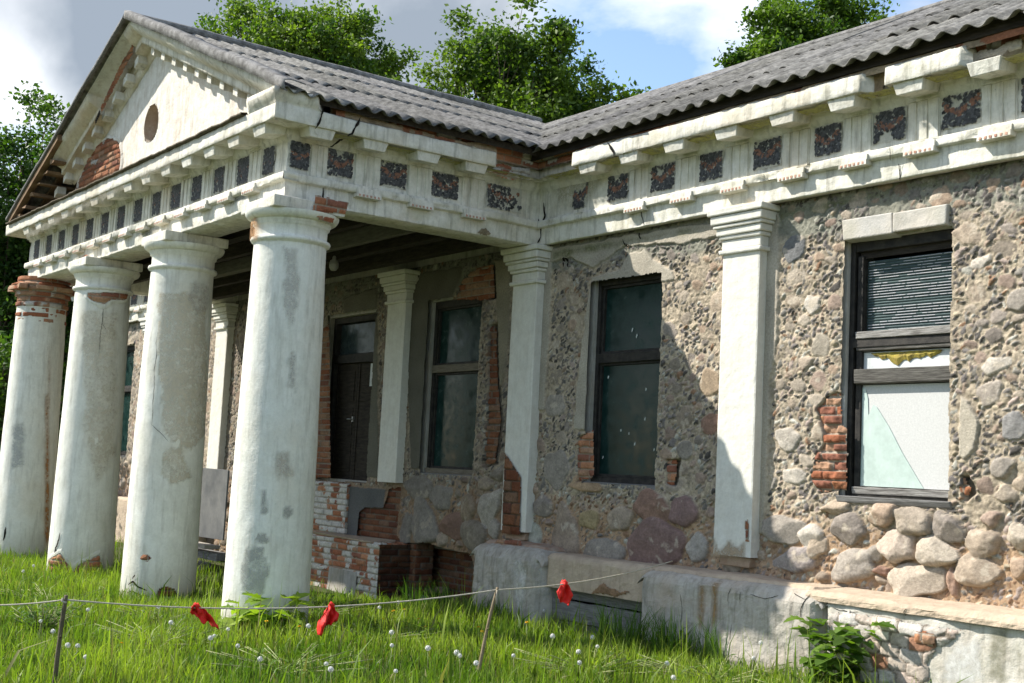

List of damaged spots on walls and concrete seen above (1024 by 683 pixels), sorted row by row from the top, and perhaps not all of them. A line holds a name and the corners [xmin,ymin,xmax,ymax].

crack [315,105,361,147]
spalling [75,135,123,190]
spalling [313,195,349,223]
spalling [84,289,129,309]
spalling [485,326,522,546]
spalling [577,430,594,481]
spalling [811,393,848,492]
spalling [47,549,105,575]
leakage [241,534,268,593]